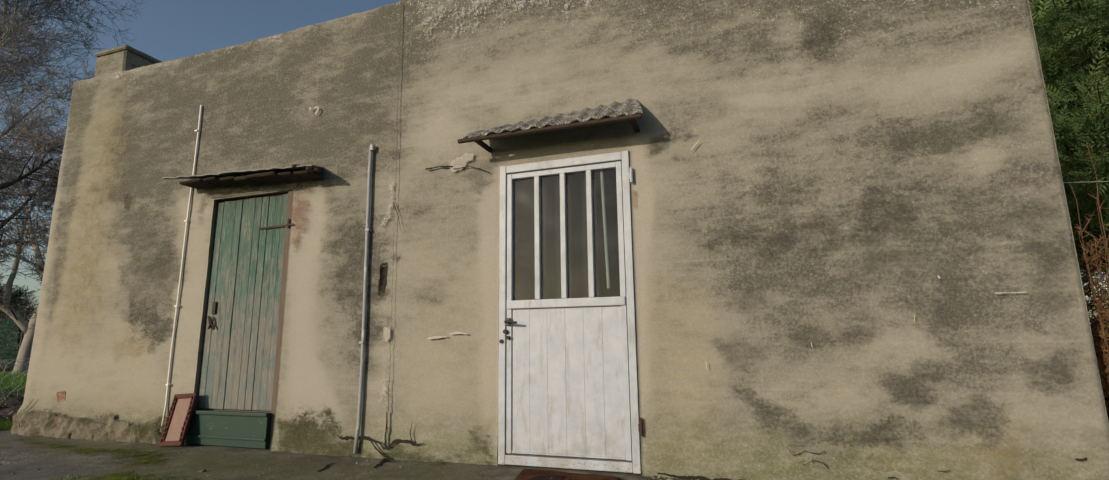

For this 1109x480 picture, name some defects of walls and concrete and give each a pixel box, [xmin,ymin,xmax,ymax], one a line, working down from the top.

leakage [422,0,549,38]
flaking render [450,153,474,172]
leakage [276,410,362,457]
leakage [735,390,895,444]
crack [657,472,743,480]